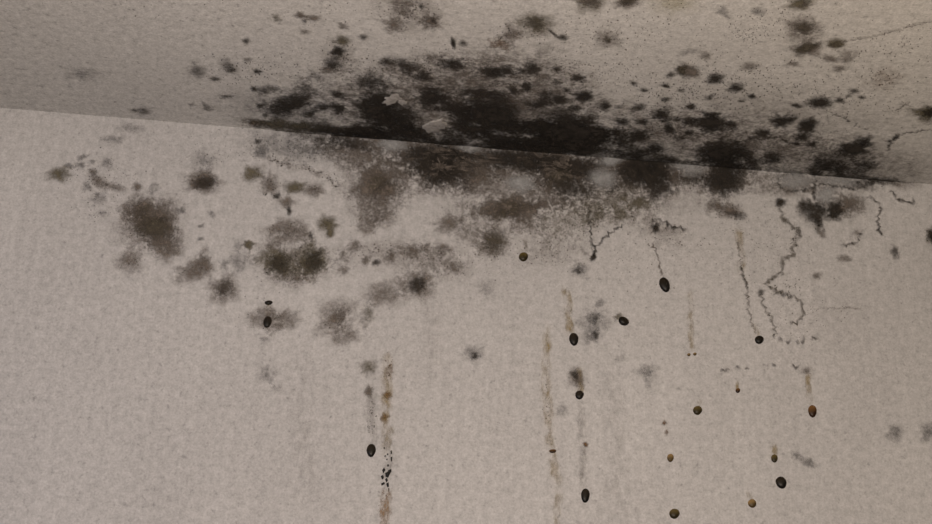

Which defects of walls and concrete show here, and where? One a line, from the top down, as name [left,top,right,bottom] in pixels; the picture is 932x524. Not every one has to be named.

leakage [212,54,274,93]
leakage [52,156,119,222]
leakage [189,136,229,190]
leakage [245,0,932,280]
leakage [122,200,184,258]
leakage [183,257,212,279]
leakage [207,279,234,298]
leakage [409,274,431,295]
crack [588,222,622,260]
crack [747,183,854,343]